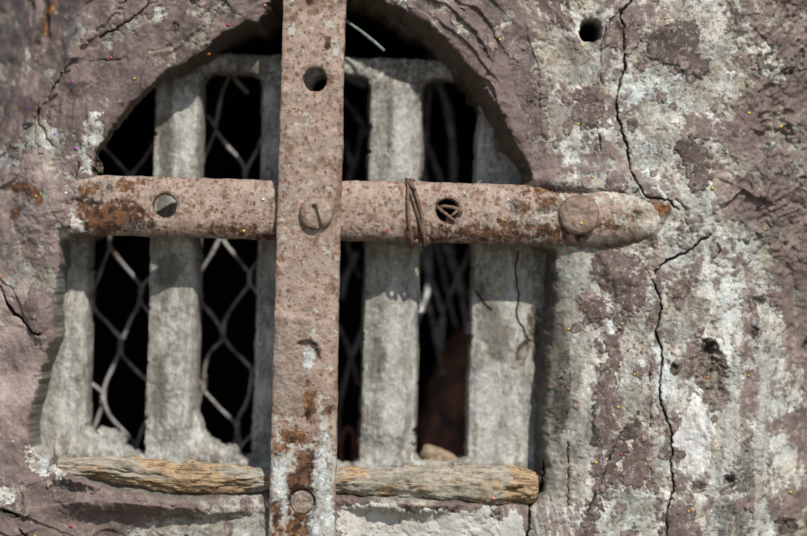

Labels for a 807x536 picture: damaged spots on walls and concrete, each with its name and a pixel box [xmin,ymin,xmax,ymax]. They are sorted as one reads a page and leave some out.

spalling [345,11,429,60]
spalling [203,75,262,180]
peeling [451,0,747,193]
crack [1,287,40,335]
rust [8,182,43,206]
spalling [54,212,150,451]
rust [66,177,155,235]
spalling [199,238,258,454]
rust [406,187,588,244]
crack [600,0,720,534]
rust [270,379,338,536]
crack [526,463,545,536]